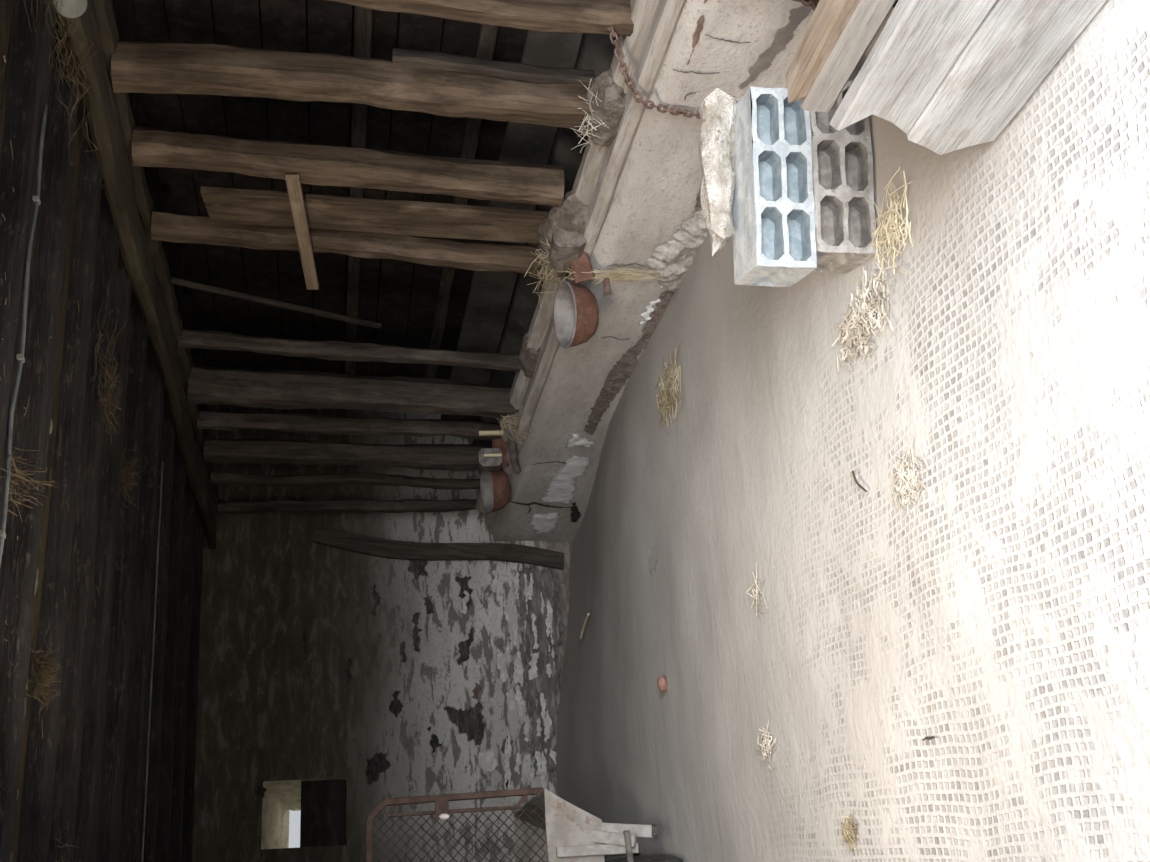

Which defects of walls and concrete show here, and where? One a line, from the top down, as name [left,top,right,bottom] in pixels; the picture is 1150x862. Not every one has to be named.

spalling [583,291,674,435]
spalling [570,502,582,522]
flaking render [408,560,428,580]
flaking render [400,597,434,662]
flaking render [389,691,403,717]
peeling [444,562,564,826]
flaking render [427,726,441,753]
flaking render [366,752,390,784]